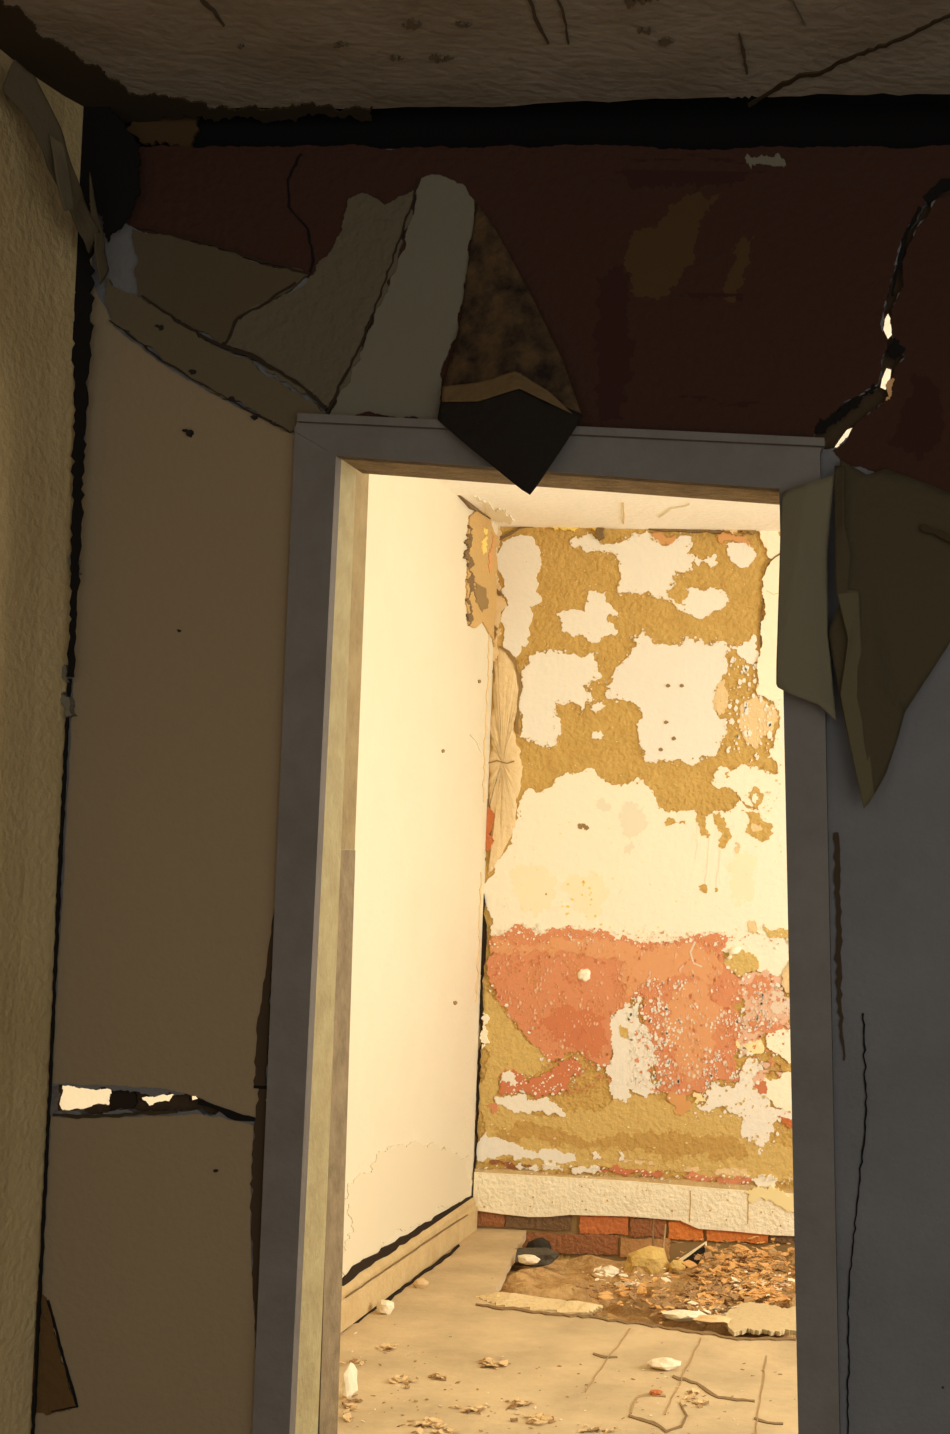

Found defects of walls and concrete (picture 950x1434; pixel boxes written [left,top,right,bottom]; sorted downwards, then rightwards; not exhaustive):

crack [738,14,950,108]
flaking render [80,107,950,492]
flaking render [666,575,689,605]
flaking render [739,696,779,749]
spalling [664,786,774,853]
spalling [764,927,788,940]
spalling [724,949,759,977]
spalling [109,1090,138,1111]
flaking render [476,990,793,1191]